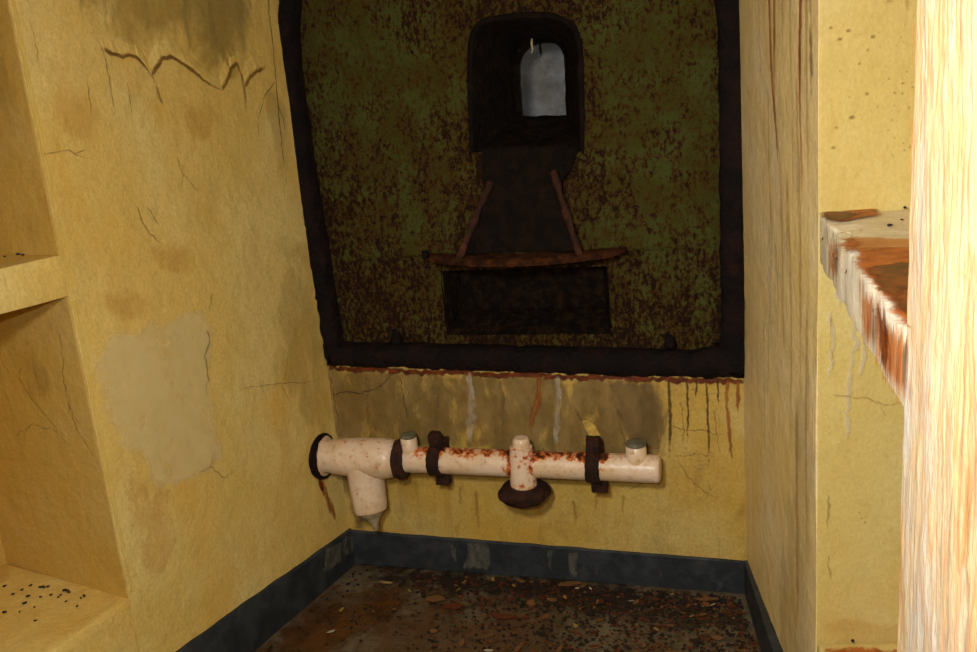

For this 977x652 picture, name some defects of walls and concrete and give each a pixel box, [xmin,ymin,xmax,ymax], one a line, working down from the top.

corrosion [821,209,911,396]
corrosion [329,365,744,456]
corrosion [318,479,335,518]